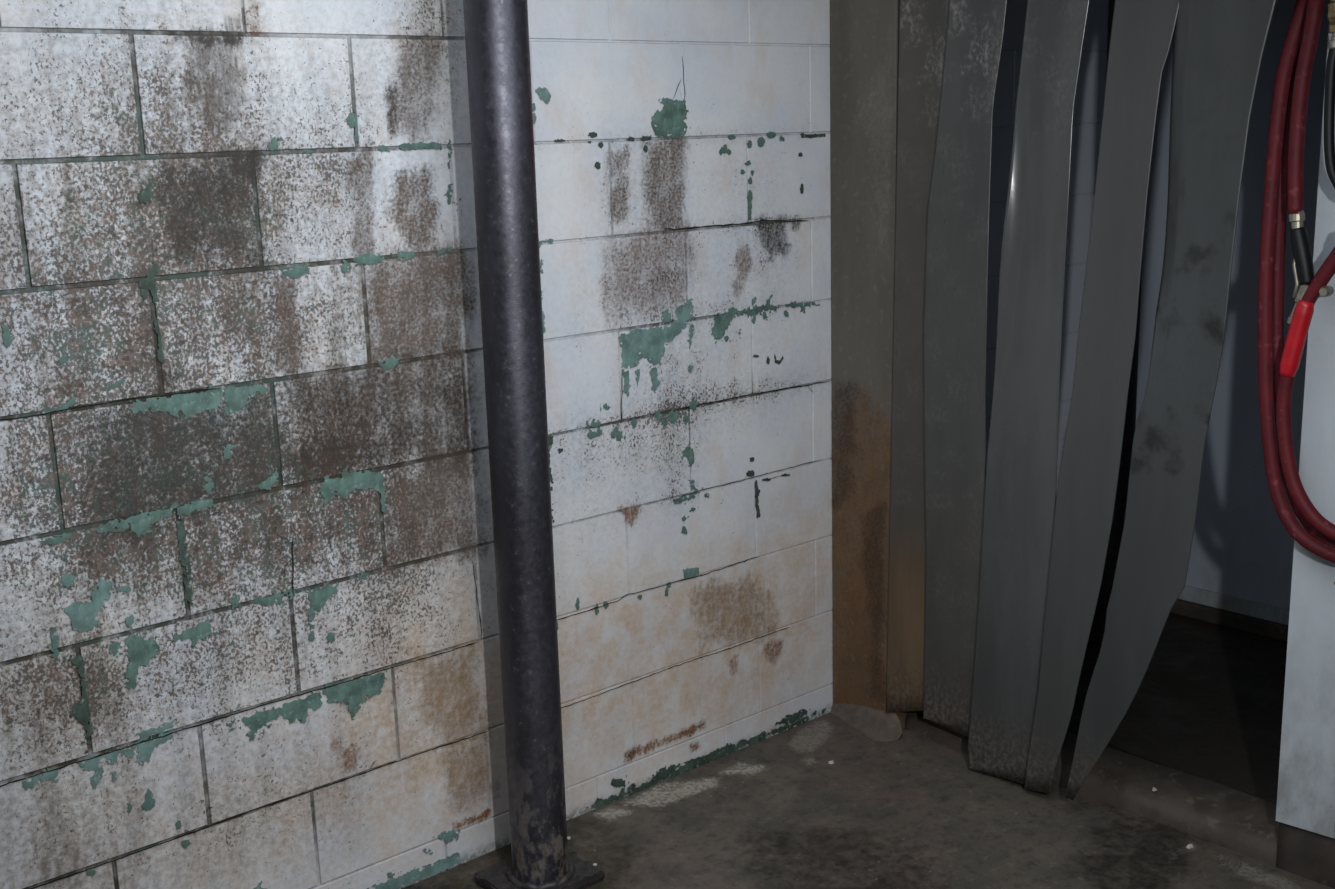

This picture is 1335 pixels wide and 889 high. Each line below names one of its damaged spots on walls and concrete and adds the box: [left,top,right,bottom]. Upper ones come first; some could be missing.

water stain [173,27,244,130]
water stain [387,36,441,141]
peeling [628,97,689,153]
water stain [603,136,691,317]
water stain [759,217,799,260]
water stain [90,148,488,577]
peeling [619,299,694,396]
peeling [711,295,820,344]
peeling [45,568,177,789]
peeling [228,670,387,741]
corrosion [625,722,704,761]
peeling [587,704,828,809]